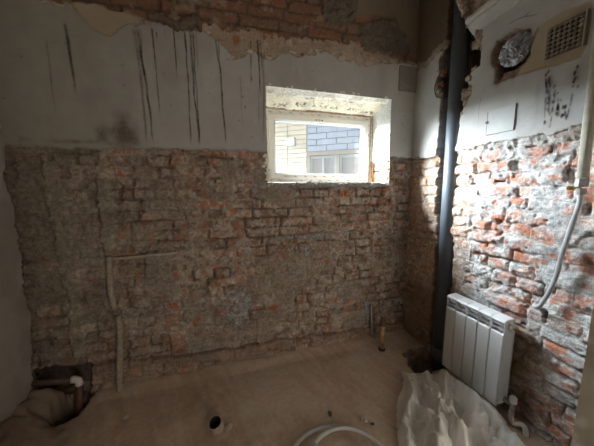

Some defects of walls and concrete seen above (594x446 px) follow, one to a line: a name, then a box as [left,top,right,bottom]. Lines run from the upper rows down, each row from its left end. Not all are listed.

flaking render [41,0,420,67]
flaking render [455,0,471,20]
flaking render [471,29,483,51]
flaking render [491,0,592,84]
water stain [184,34,200,137]
flaking render [460,66,477,115]
water stain [544,70,573,127]
spalling [259,154,391,189]
spalling [406,346,436,374]